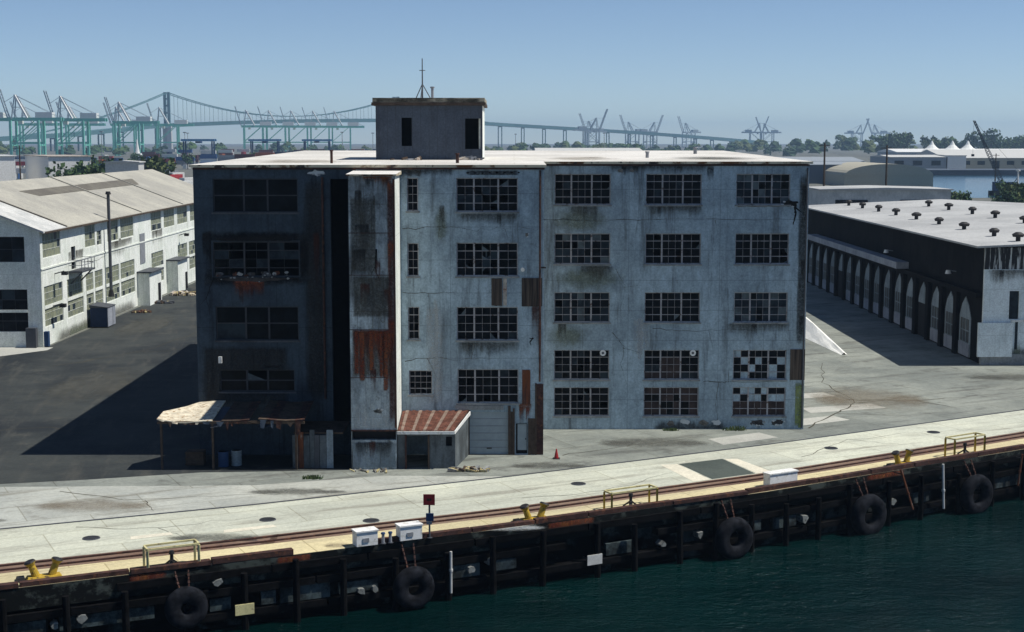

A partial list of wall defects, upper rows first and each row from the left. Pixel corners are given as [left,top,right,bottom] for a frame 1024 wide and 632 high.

corrosion [353,176,395,418]
crack [808,366,969,428]